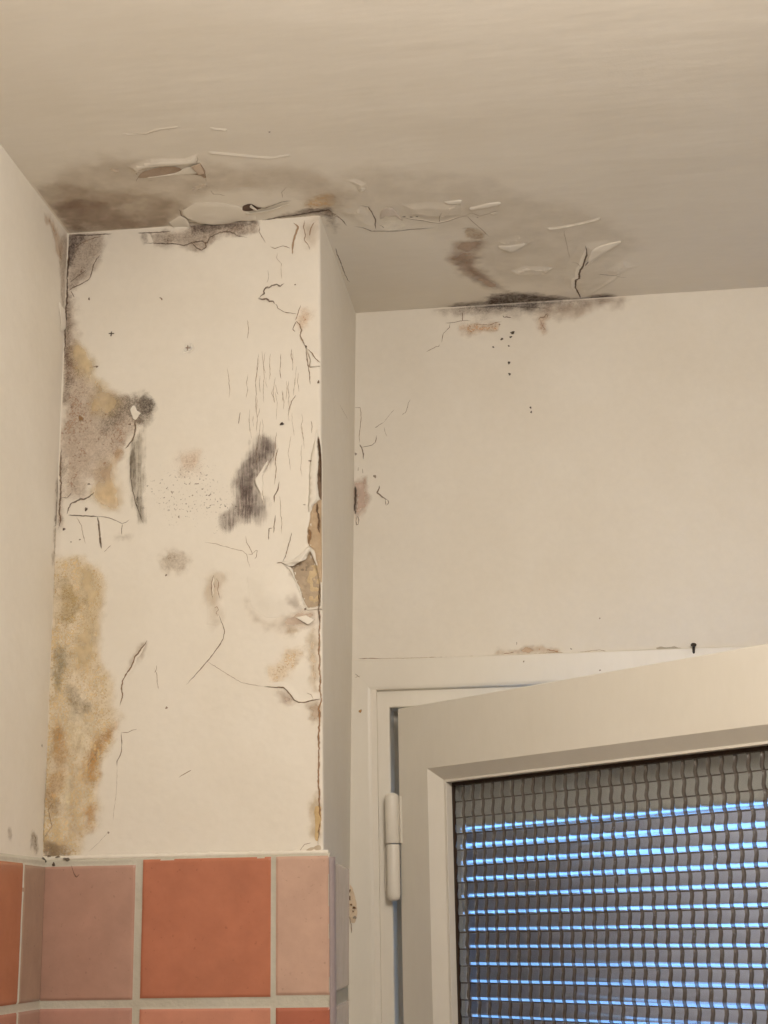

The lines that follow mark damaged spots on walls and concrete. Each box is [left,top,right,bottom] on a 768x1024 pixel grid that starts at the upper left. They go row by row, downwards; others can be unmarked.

crack [63,247,71,351]
peeling [127,154,206,179]
peeling [169,201,289,229]
crack [227,190,487,464]
damp [454,274,562,309]
crack [564,234,624,299]
damp [55,347,152,526]
crack [59,451,126,552]
damp [225,475,252,525]
flaking render [278,430,322,622]
crack [117,641,158,761]
crack [193,616,322,851]